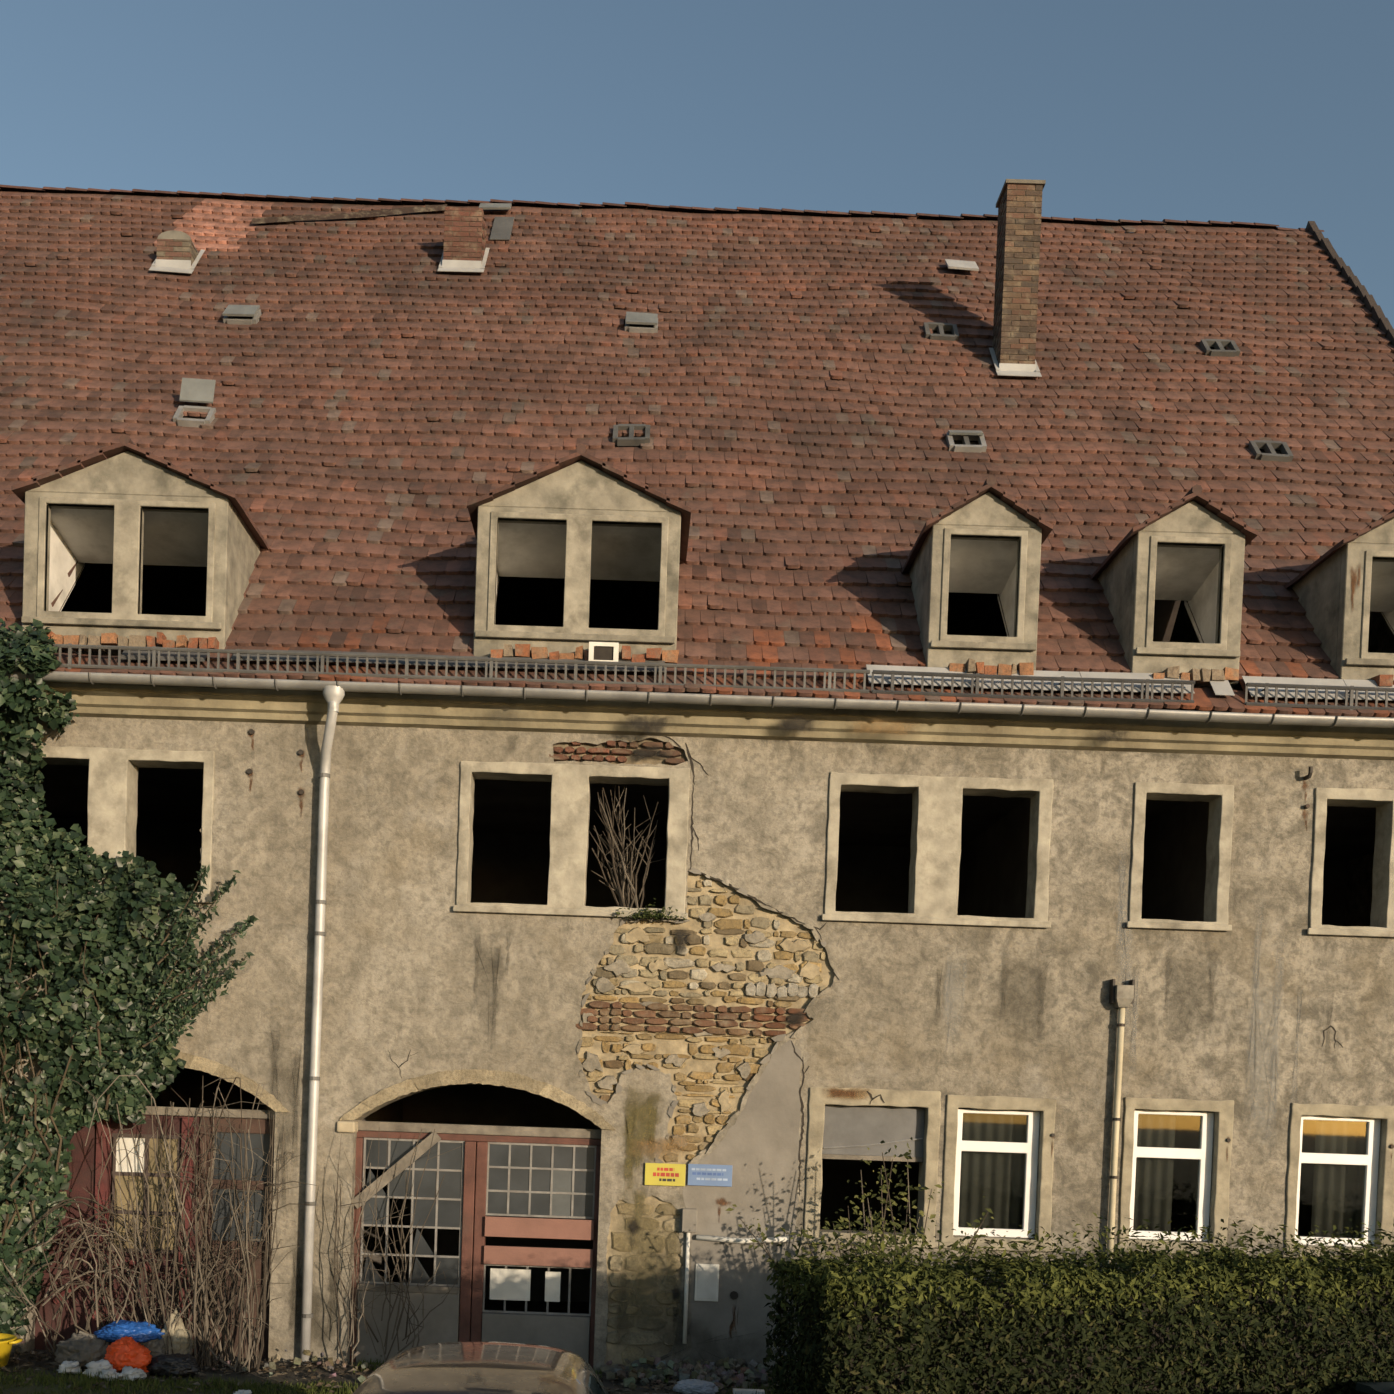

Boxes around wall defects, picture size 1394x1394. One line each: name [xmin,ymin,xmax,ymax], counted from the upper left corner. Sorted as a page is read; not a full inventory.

flaking render [549,740,685,765]
crack [665,736,827,940]
spalling [575,868,841,1165]
crack [791,1041,809,1195]
spalling [604,1195,684,1366]